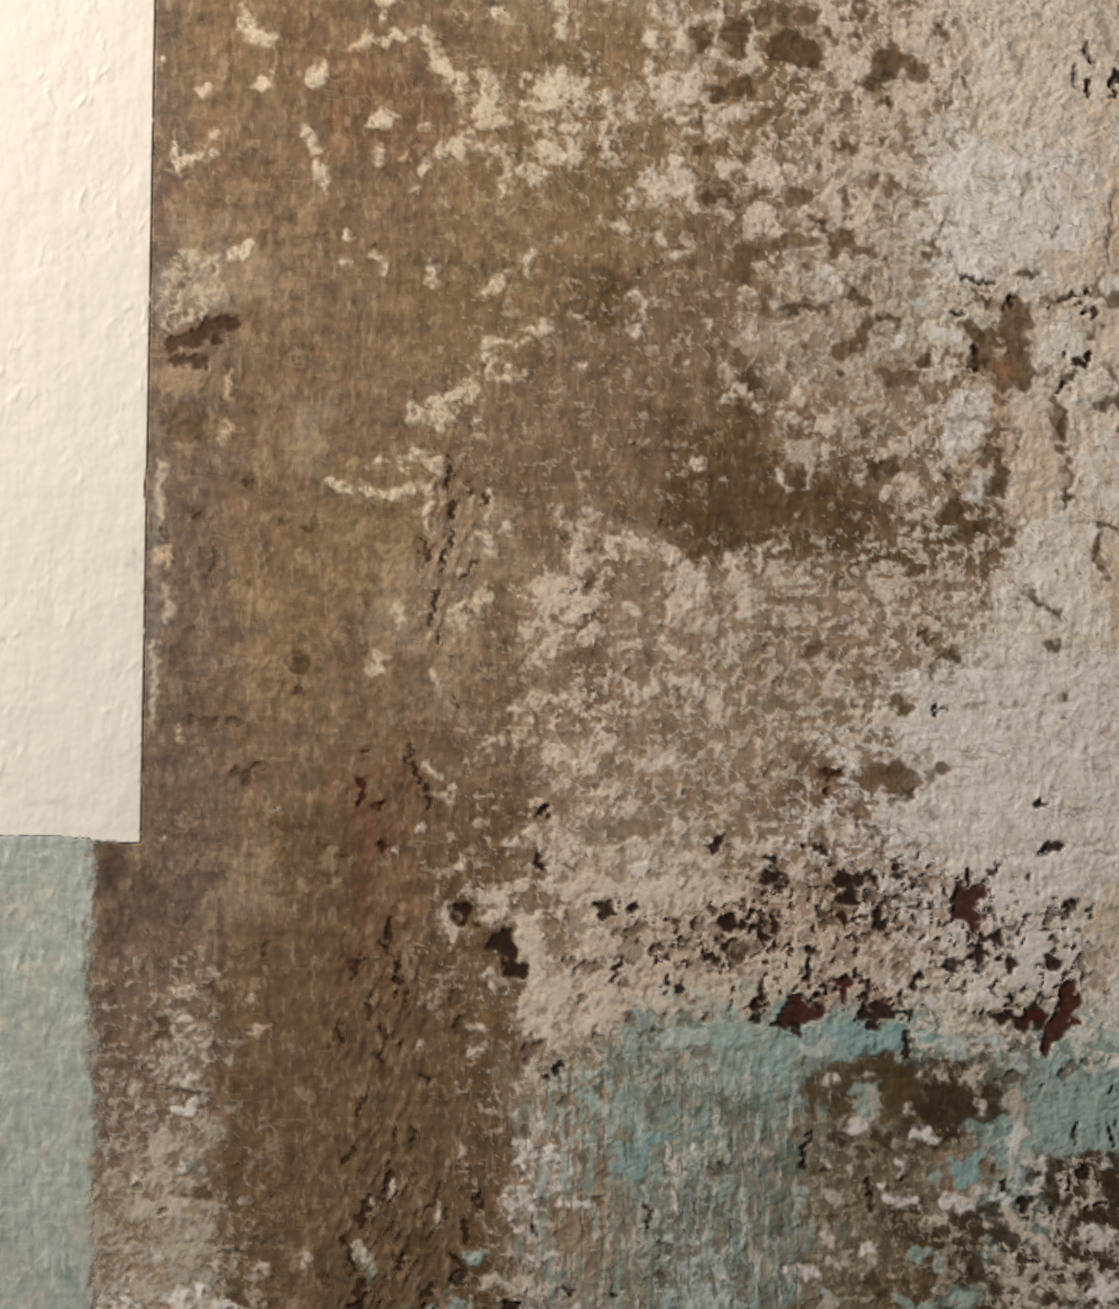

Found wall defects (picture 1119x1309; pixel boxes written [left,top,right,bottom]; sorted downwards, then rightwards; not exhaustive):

peeling [150,0,417,360]
peeling [123,365,325,739]
peeling [169,719,188,745]
corrosion [819,765,851,798]
corrosion [905,785,917,803]
corrosion [637,808,1101,1087]